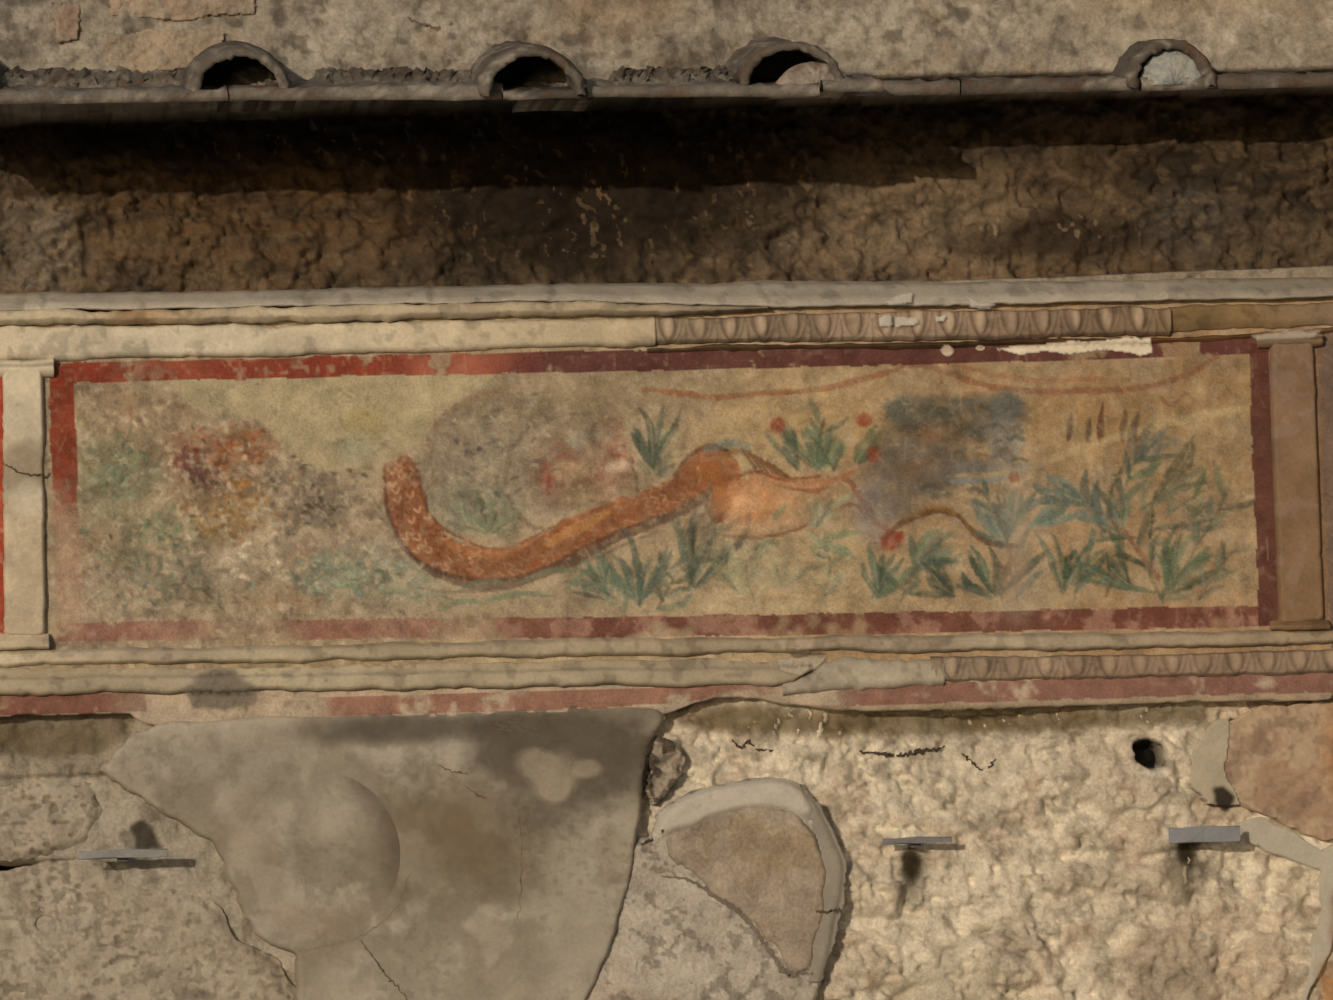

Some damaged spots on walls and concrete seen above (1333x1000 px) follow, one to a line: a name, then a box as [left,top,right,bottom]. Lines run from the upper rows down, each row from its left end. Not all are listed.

spalling [879,292,918,327]
peeling [941,345,954,356]
peeling [976,337,1152,356]
crack [2,462,51,479]
crack [859,745,996,771]
spalling [1134,740,1165,768]
crack [299,874,411,1000]